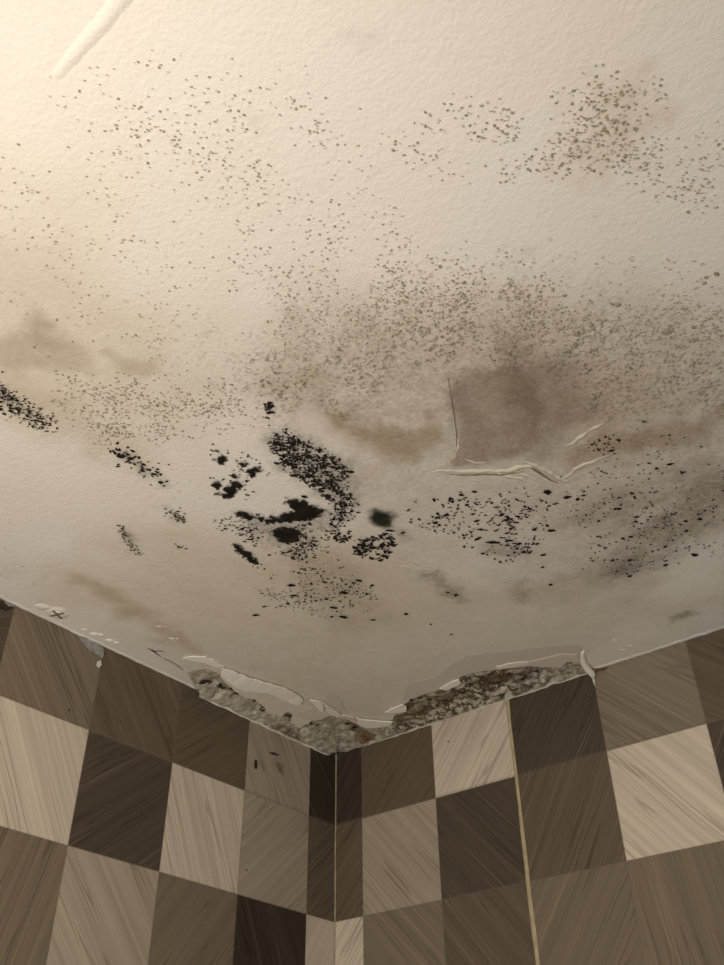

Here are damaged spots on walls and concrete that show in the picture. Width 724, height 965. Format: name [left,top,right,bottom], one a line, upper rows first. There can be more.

damp [49,66,312,260]
damp [379,93,523,184]
damp [499,64,724,214]
damp [0,199,724,621]
spalling [183,644,607,755]